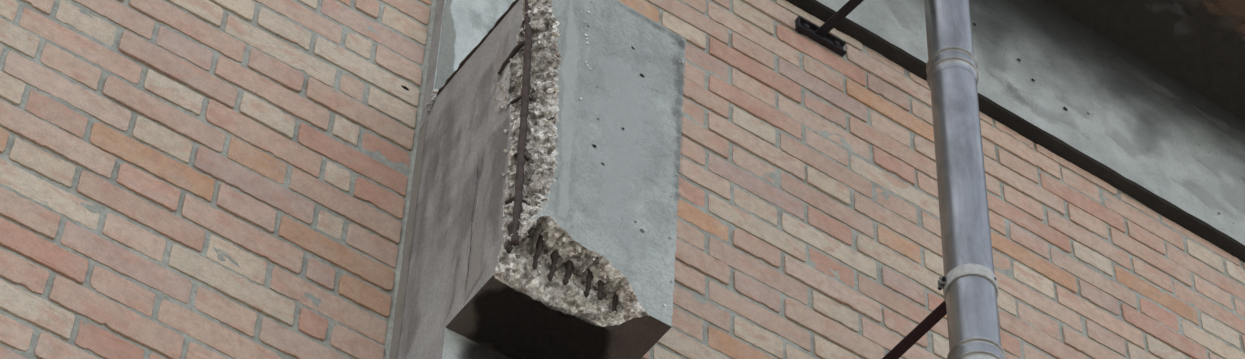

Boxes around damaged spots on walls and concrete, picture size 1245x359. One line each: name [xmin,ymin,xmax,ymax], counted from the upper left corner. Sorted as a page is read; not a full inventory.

spalling [425,0,649,327]
damp [1043,0,1245,120]